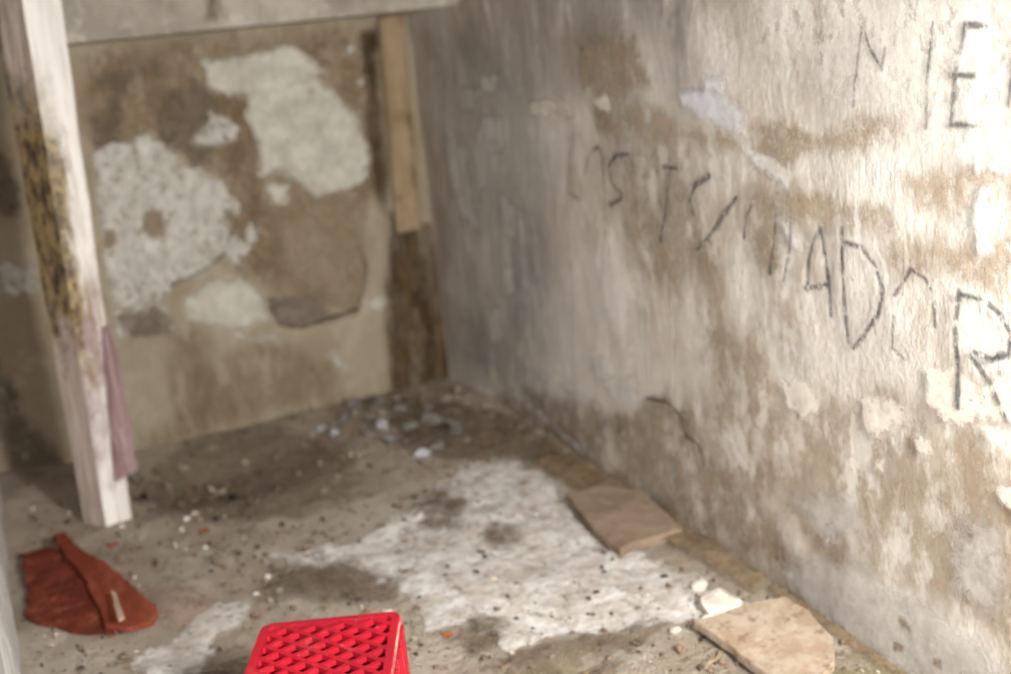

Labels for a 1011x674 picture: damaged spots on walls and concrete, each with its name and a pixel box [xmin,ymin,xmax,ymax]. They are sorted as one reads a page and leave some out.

peeling [196,45,370,204]
peeling [92,134,390,344]
peeling [497,338,992,674]
damp [727,401,1011,624]
peeling [954,524,1002,607]
peeling [998,487,1011,509]